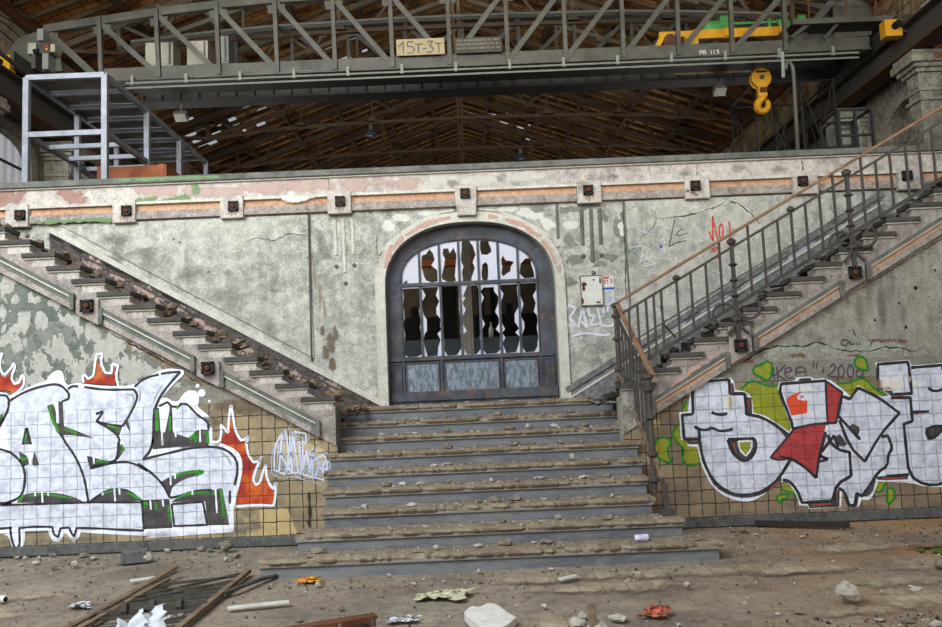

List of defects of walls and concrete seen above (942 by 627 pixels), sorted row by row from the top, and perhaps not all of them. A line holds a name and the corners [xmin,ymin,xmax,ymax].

peeling [0,191,26,207]
peeling [82,256,164,303]
peeling [135,237,160,248]
peeling [170,236,207,280]
peeling [382,210,450,268]
peeling [0,275,209,392]
water stain [313,269,338,371]
crack [741,337,923,363]